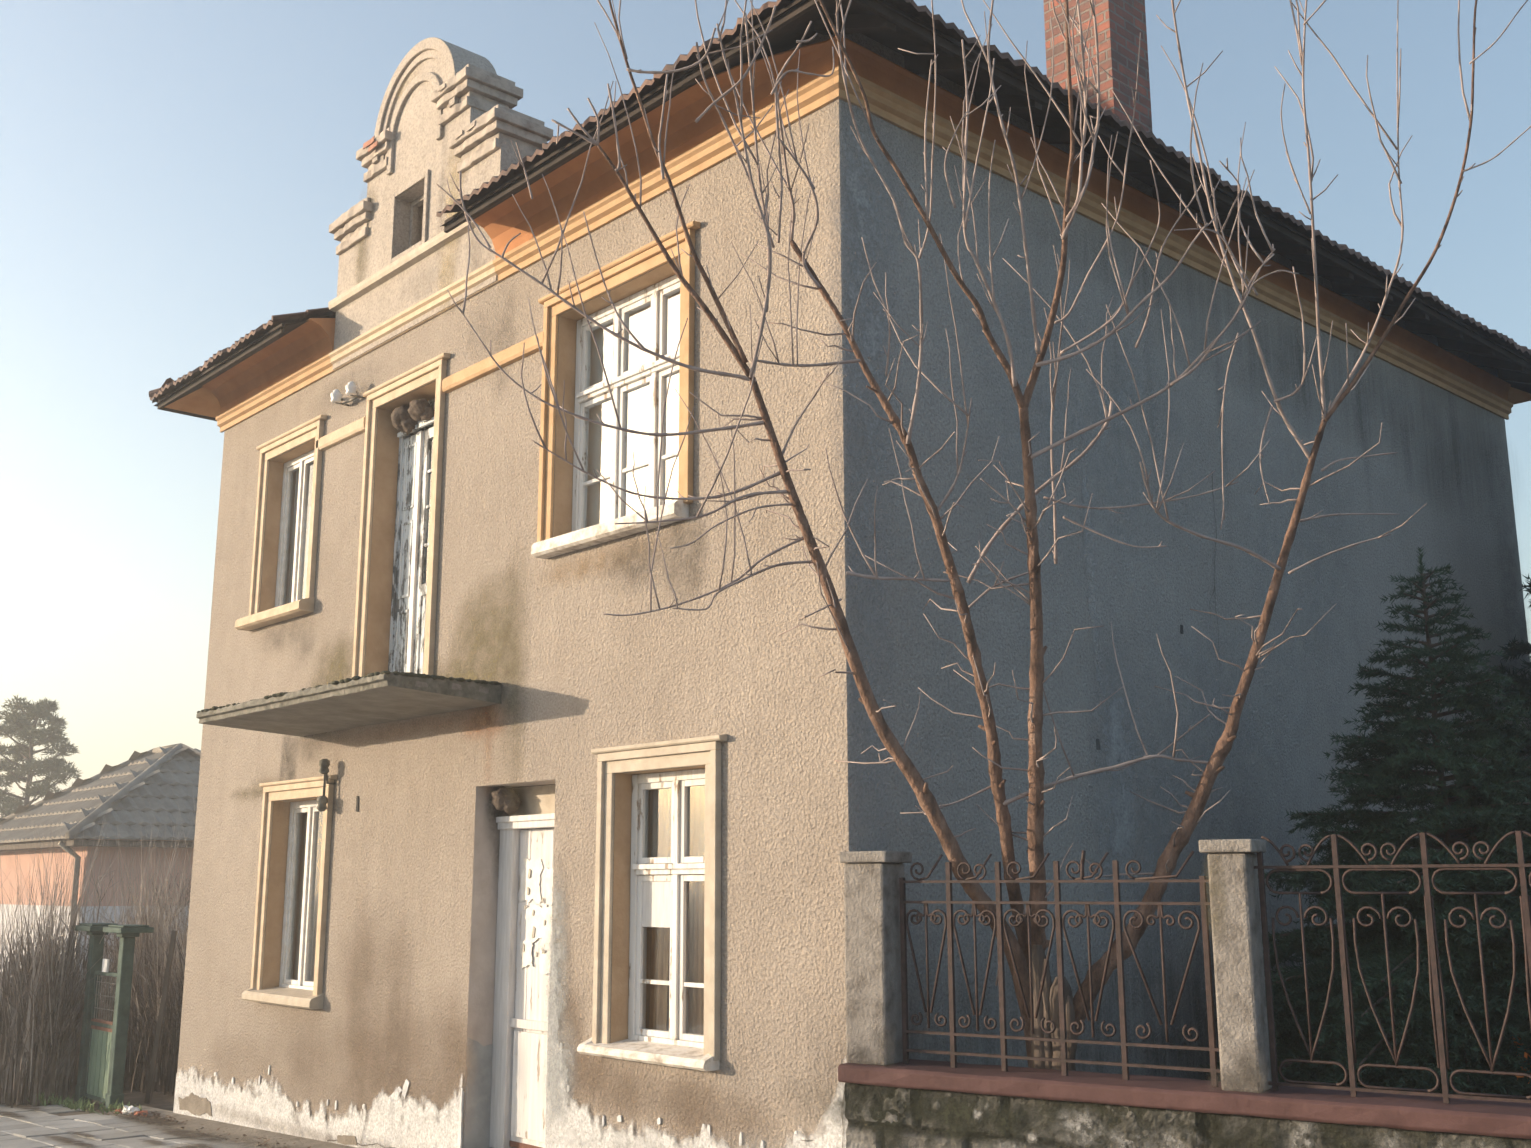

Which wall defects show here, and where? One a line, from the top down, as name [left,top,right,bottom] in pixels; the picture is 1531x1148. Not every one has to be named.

peeling [545,888,765,1148]
peeling [173,1065,464,1148]
peeling [786,1082,848,1148]